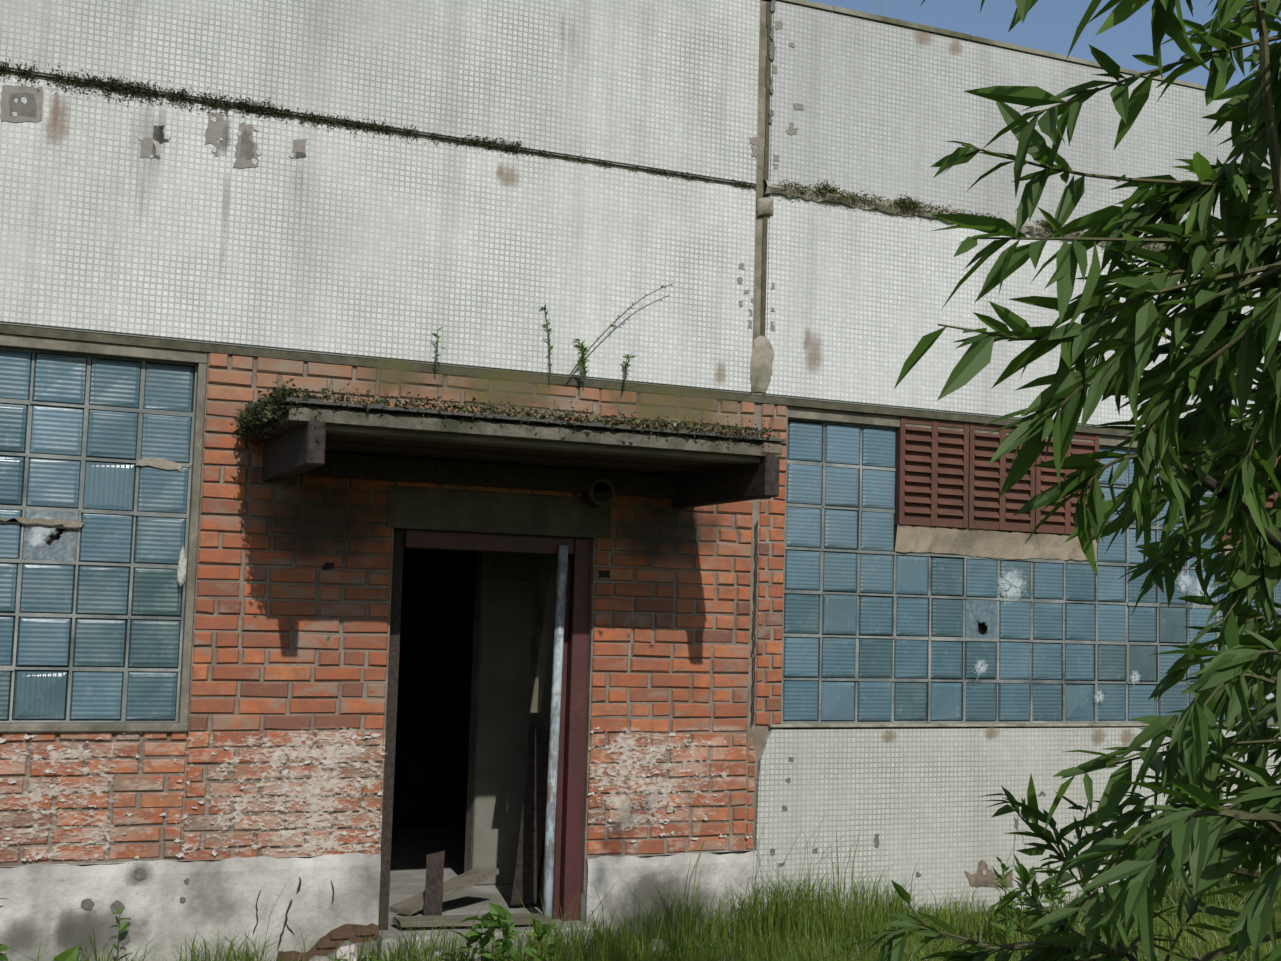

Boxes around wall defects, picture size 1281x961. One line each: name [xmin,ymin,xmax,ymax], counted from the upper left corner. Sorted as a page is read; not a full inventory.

peeling [0,81,43,123]
peeling [139,125,171,159]
peeling [205,112,262,168]
peeling [289,139,307,158]
peeling [0,732,147,863]
peeling [155,727,386,858]
peeling [588,727,741,843]
peeling [965,860,1048,890]
damp [57,916,131,952]
crack [253,877,334,950]